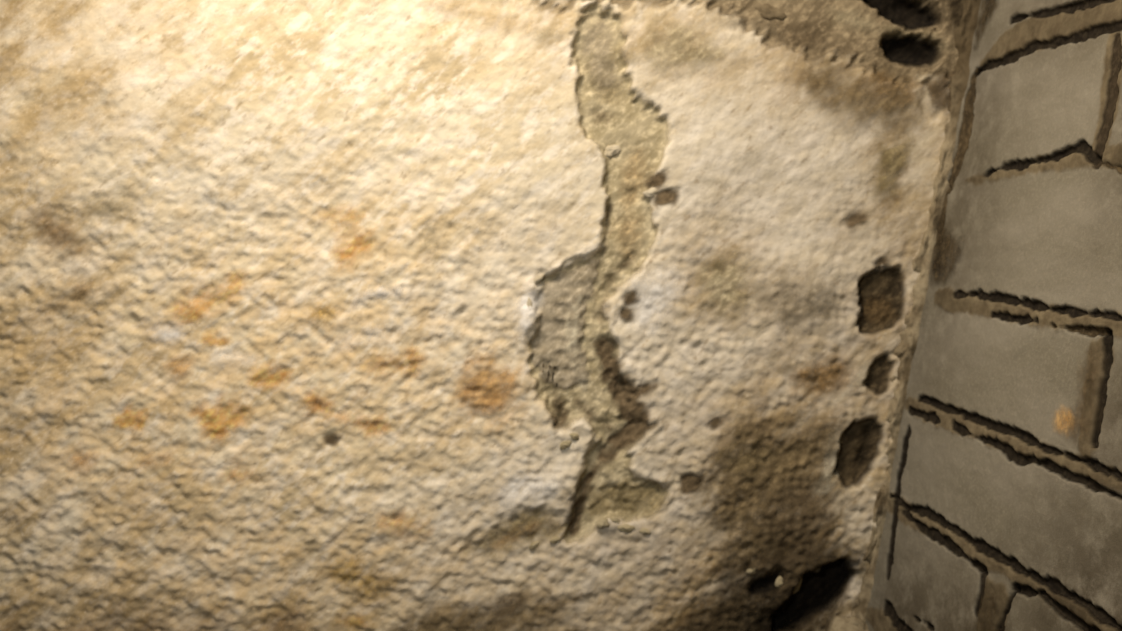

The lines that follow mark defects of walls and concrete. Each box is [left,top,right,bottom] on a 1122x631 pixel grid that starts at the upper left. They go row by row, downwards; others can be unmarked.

spalling [646,0,963,84]
water stain [804,66,913,125]
water stain [926,70,960,109]
crack [938,0,1122,228]
spalling [846,213,867,226]
spalling [468,0,678,551]
rust [252,371,286,386]
rust [459,360,513,409]
rust [200,408,245,436]
spalling [681,474,702,493]
crack [885,290,1122,631]
water stain [682,421,853,631]